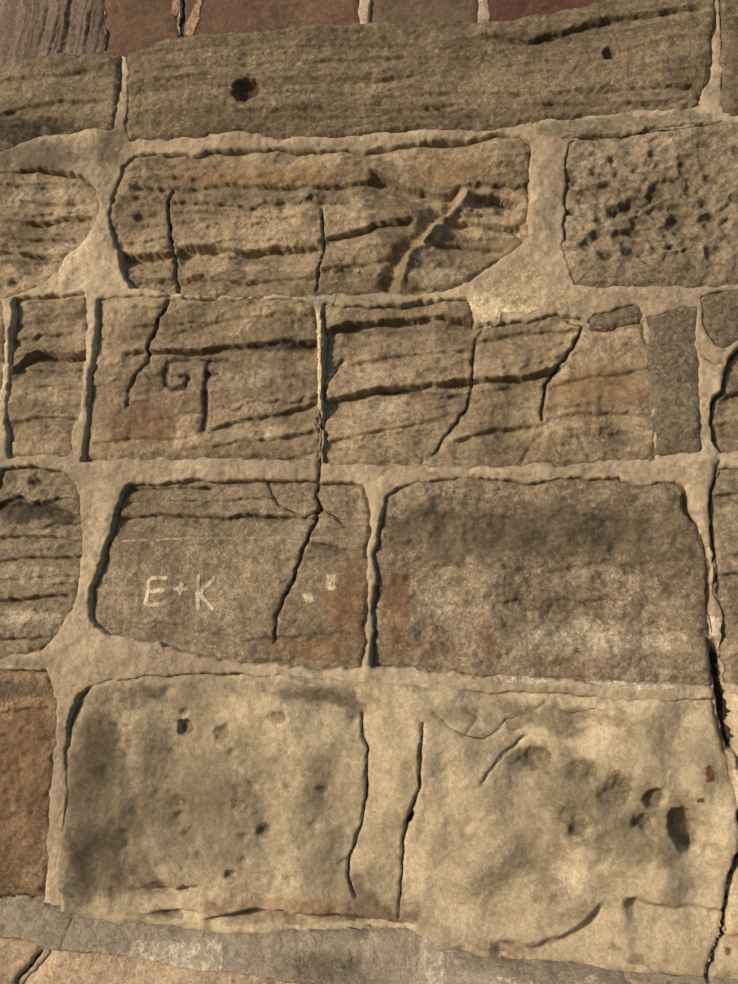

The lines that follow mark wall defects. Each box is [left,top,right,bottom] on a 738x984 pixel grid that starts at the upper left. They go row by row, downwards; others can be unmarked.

crack [178,0,186,37]
crack [128,198,181,406]
crack [436,338,478,452]
crack [541,323,581,419]
crack [270,362,346,638]
crack [705,351,738,746]
crack [348,722,369,895]
crack [399,704,605,905]
crack [711,852,738,951]